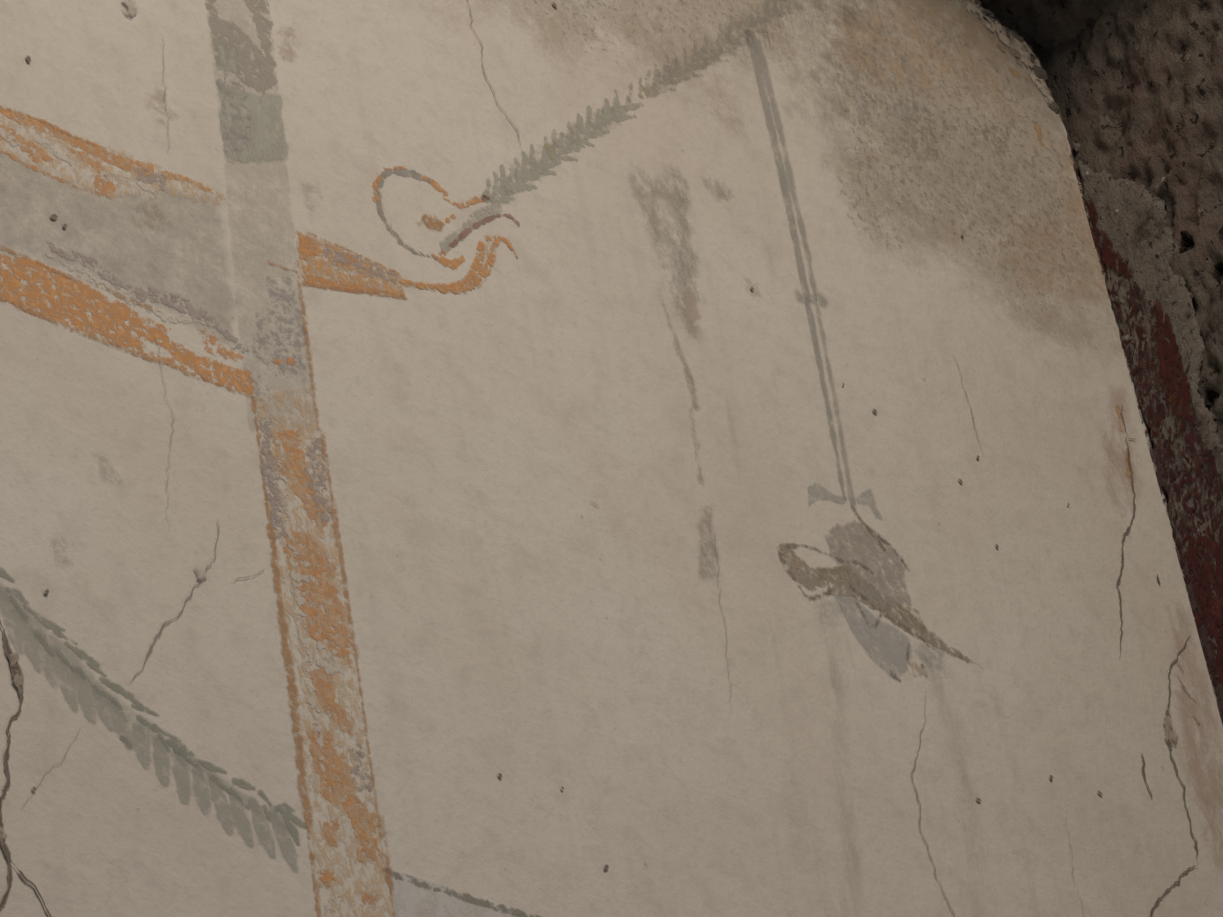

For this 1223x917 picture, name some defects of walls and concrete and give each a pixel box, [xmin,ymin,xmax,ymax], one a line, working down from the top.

crack [468,2,521,145]
water stain [822,0,1103,337]
flaking render [964,0,1060,114]
spalling [1179,231,1195,252]
spalling [1204,389,1219,408]
crack [132,523,265,680]
crack [1117,405,1136,656]
crack [0,620,52,917]
crack [911,702,955,917]
crack [1142,634,1199,917]